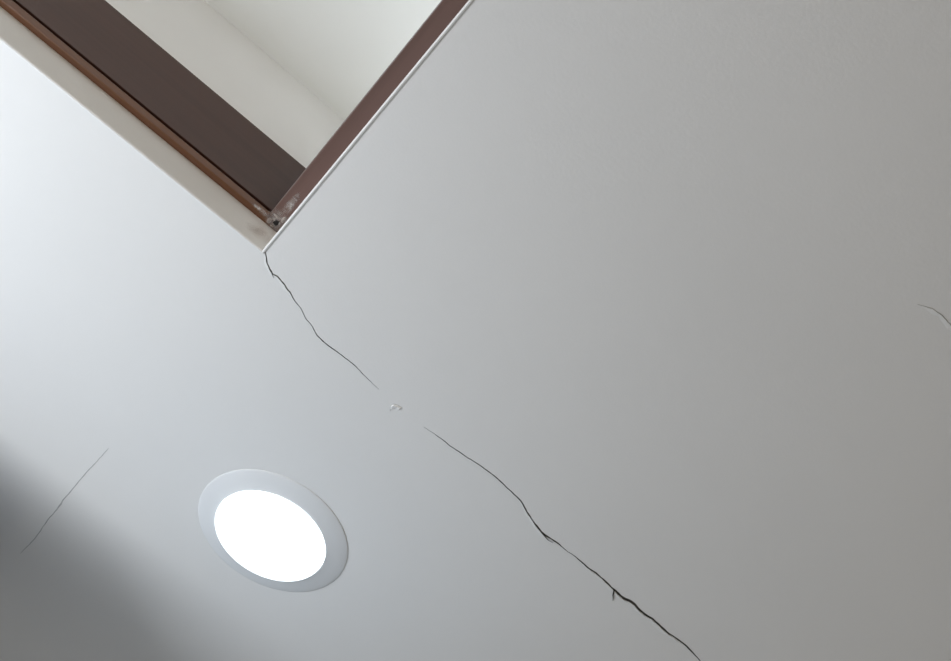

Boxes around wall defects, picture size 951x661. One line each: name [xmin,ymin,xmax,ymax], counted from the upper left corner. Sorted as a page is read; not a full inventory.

crack [264,252,374,385]
crack [424,427,700,661]